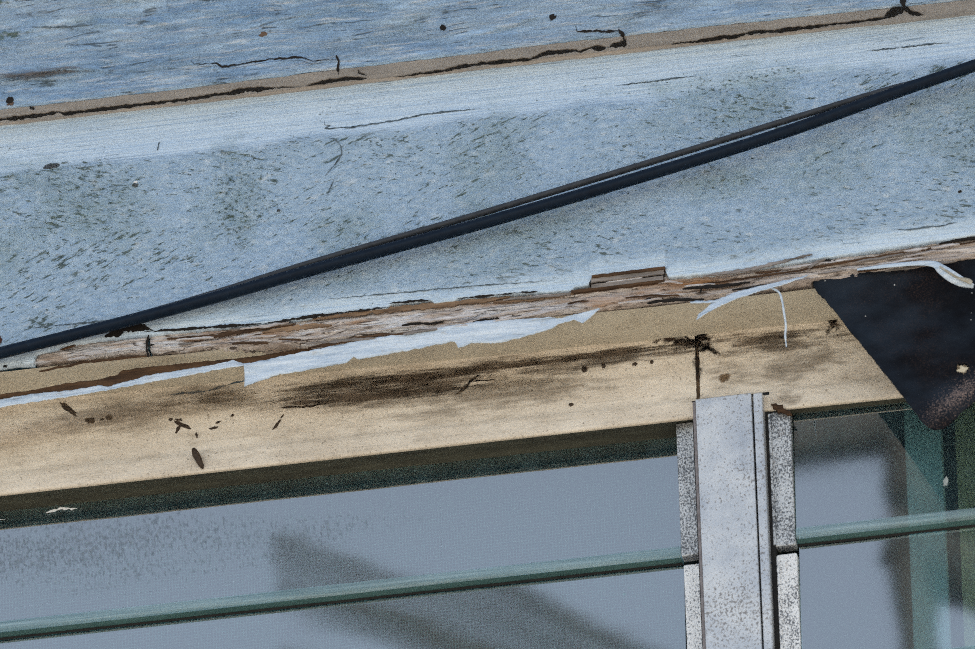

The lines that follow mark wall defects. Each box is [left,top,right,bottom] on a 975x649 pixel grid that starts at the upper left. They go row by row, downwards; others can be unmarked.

crack [397,28,627,77]
crack [0,55,367,121]
peeling [857,261,974,288]
peeling [0,308,600,408]
water stain [276,348,642,405]
water stain [654,334,722,381]
crack [694,343,702,399]